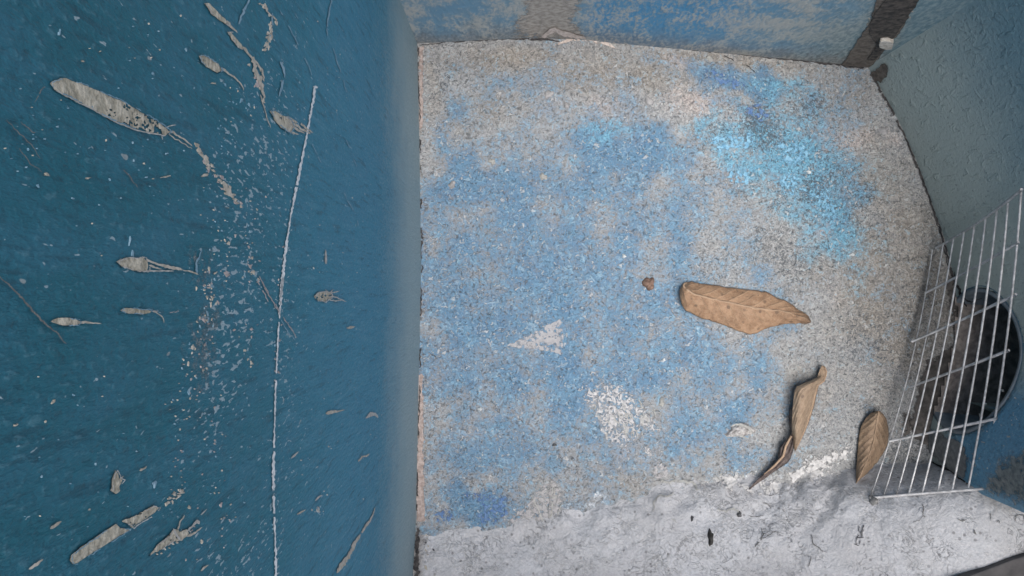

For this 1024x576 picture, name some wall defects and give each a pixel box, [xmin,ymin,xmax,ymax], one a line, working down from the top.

peeling [199,3,329,166]
peeling [49,78,261,565]
peeling [314,289,355,309]
peeling [337,508,380,573]